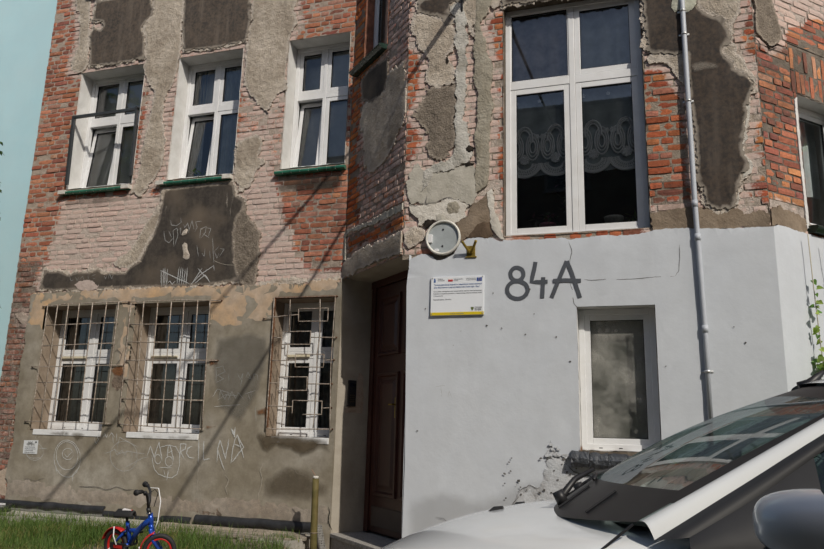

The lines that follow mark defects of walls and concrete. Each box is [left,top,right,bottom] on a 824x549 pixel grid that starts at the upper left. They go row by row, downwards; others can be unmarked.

peeling [181,229,190,259]
peeling [75,280,99,291]
crack [570,245,680,311]
peeling [505,443,590,504]